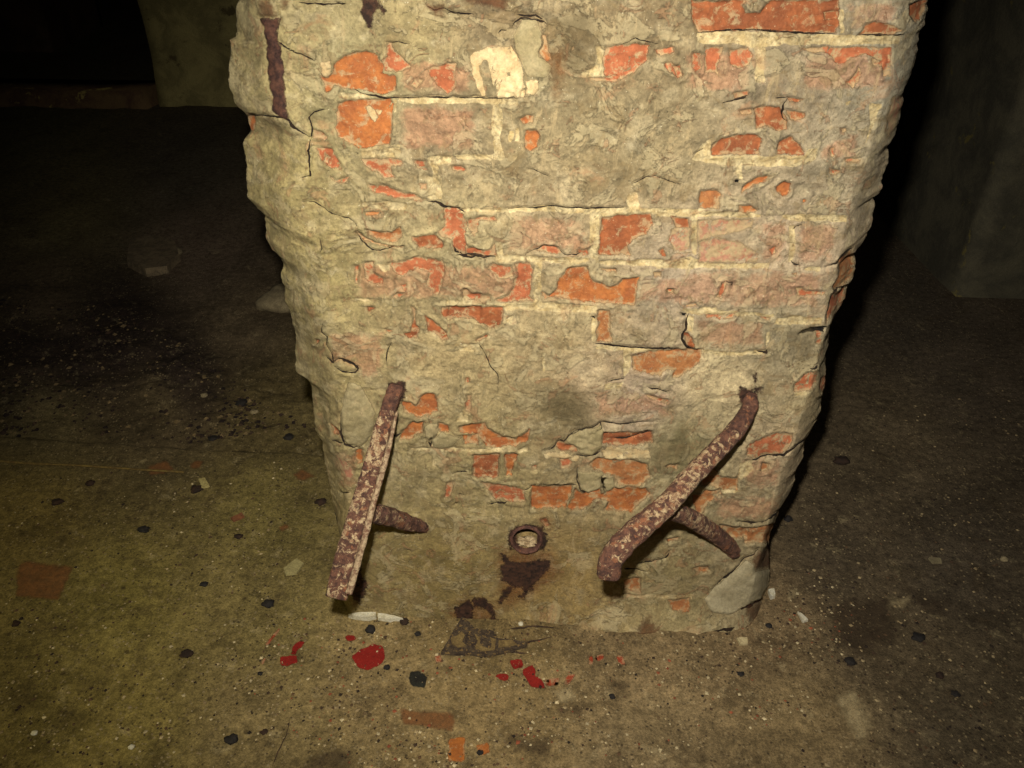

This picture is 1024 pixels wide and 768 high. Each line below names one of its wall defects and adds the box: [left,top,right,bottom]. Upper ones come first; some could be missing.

rust [260,1,289,120]
spalling [313,42,427,201]
spalling [711,97,805,156]
crack [248,108,393,251]
crack [508,203,624,211]
spalling [355,207,653,342]
crack [596,313,695,350]
rust [388,380,407,406]
spalling [400,393,653,527]
crack [490,421,652,504]
rust [352,567,368,605]
rust [454,524,550,620]